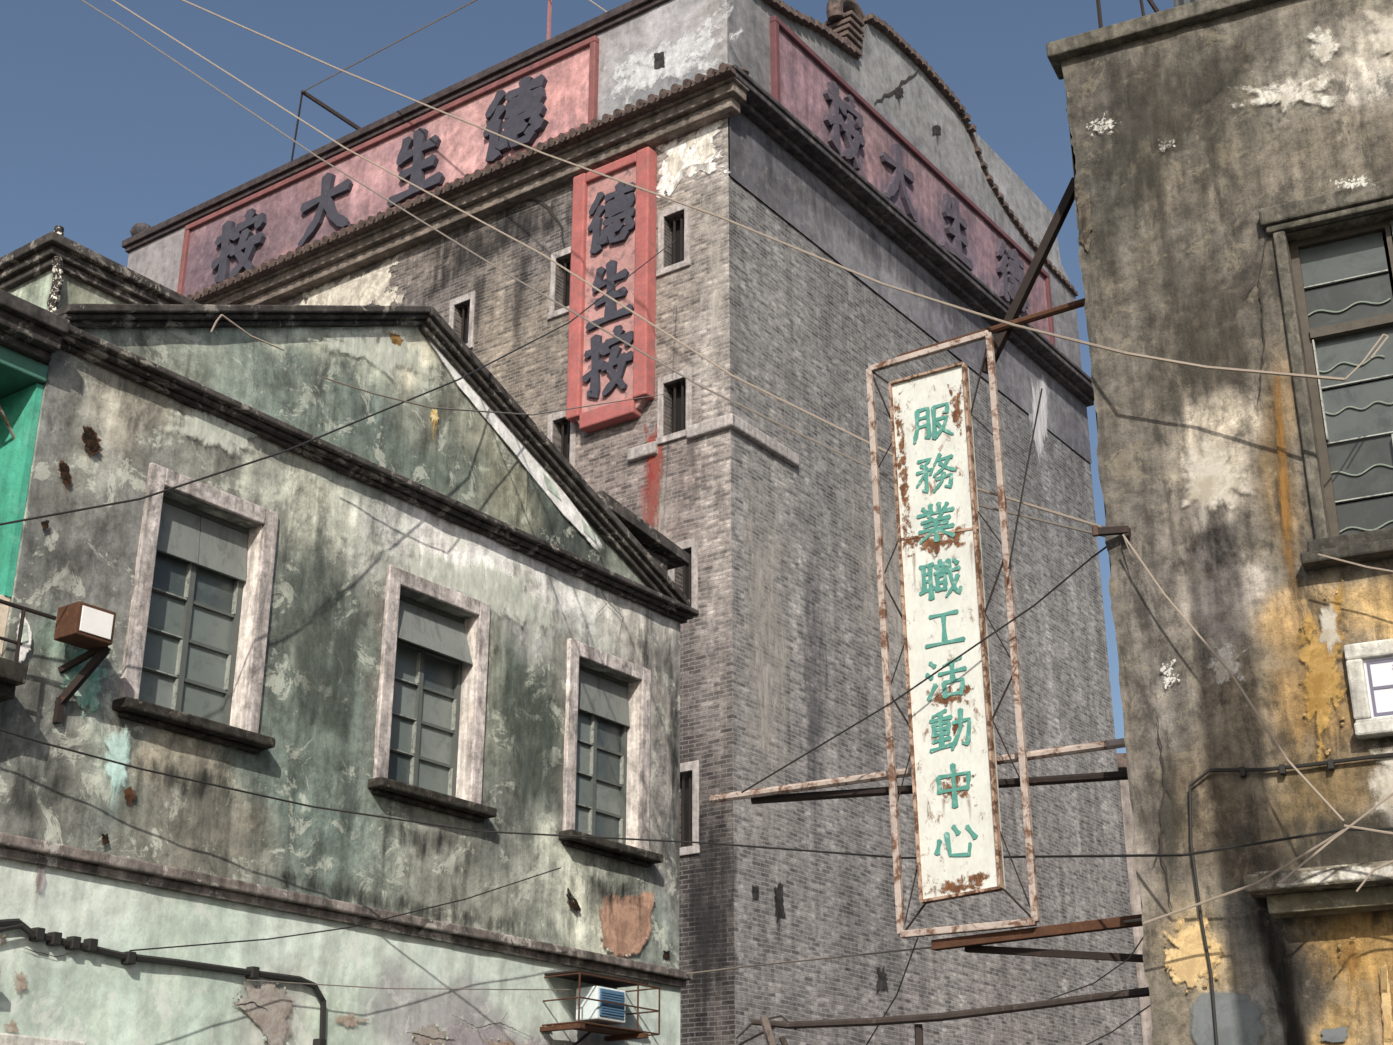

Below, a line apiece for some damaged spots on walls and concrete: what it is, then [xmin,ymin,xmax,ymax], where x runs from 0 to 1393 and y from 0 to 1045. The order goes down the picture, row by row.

damp [1365,10,1393,55]
corrosion [947,379,963,436]
corrosion [893,393,965,559]
damp [365,545,553,629]
peeling [1297,580,1346,761]
damp [36,865,46,892]
damp [338,883,468,925]
flaking render [600,891,655,957]
corrosion [925,872,989,894]
peeling [1164,917,1224,993]
peeling [232,979,293,1045]
peeling [407,1023,456,1045]